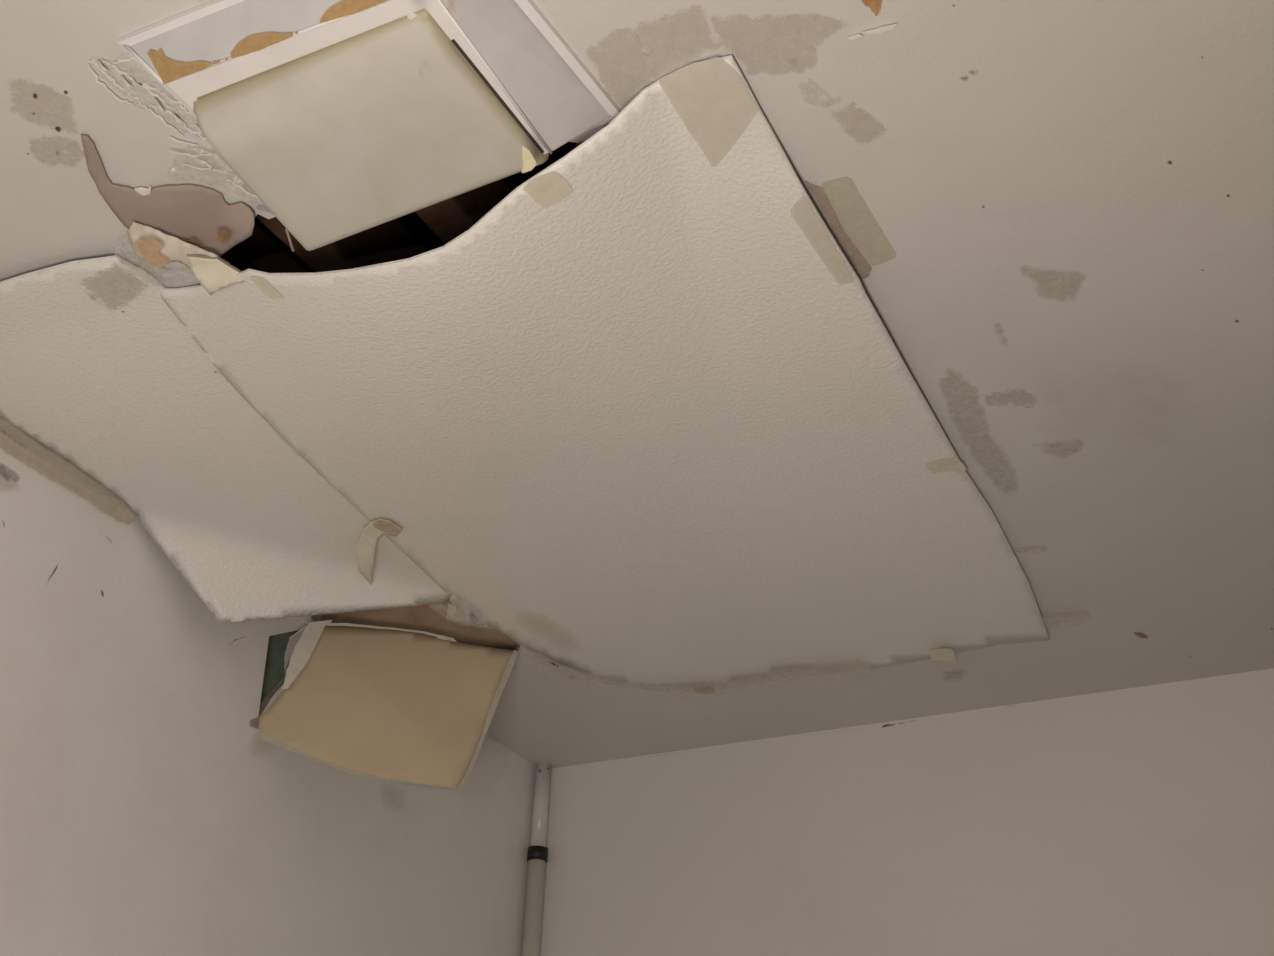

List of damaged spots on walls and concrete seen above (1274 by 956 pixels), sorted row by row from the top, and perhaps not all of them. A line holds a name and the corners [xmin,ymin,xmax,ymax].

peeling [81,134,255,295]